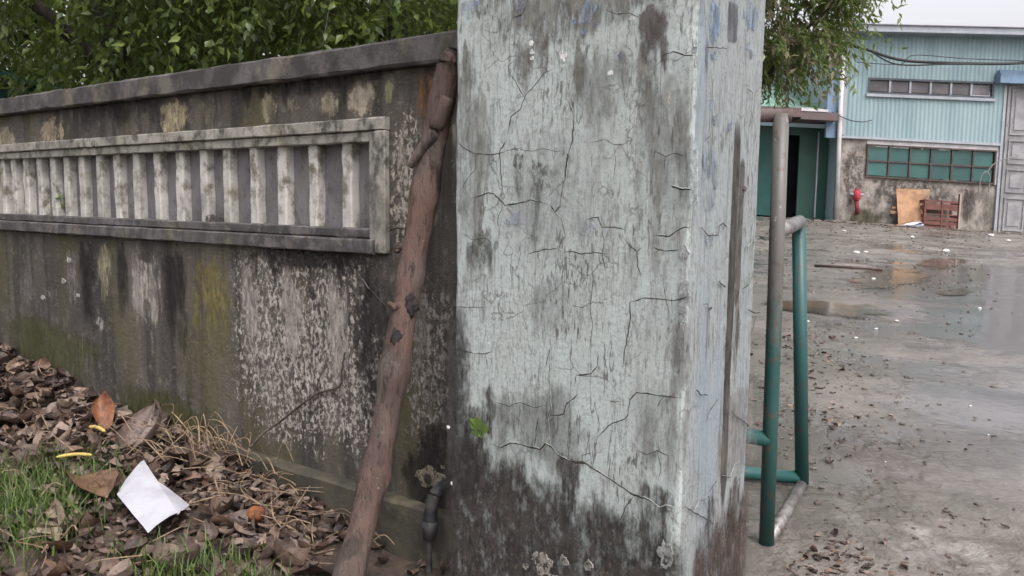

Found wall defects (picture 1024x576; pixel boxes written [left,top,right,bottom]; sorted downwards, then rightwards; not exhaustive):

leakage [637,4,668,107]
crack [662,47,727,56]
leakage [66,241,216,350]
leakage [250,248,393,433]
crack [457,61,760,524]
leakage [402,314,683,576]